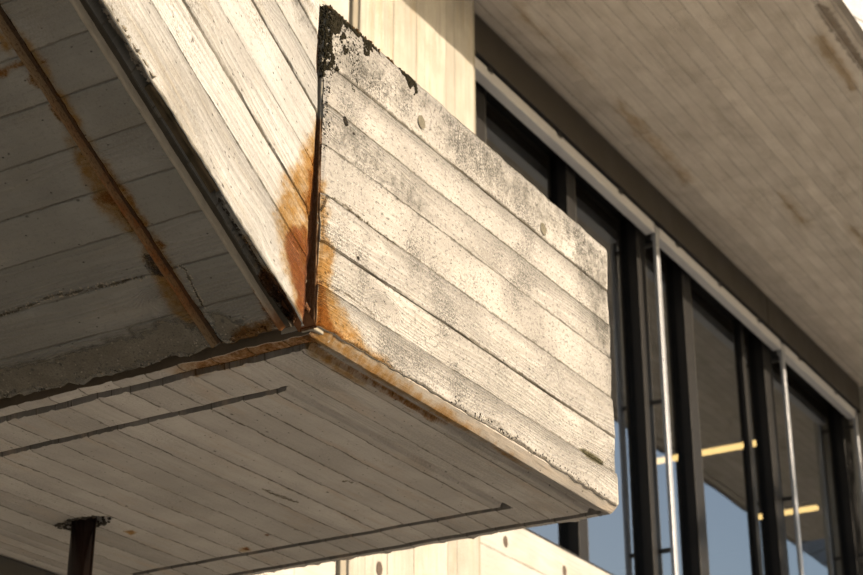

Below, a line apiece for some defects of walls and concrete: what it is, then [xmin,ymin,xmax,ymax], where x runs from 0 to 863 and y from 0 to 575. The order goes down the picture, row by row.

spalling [98,0,157,82]
spalling [218,198,317,332]
corrosion [287,119,343,338]
spalling [0,318,209,398]